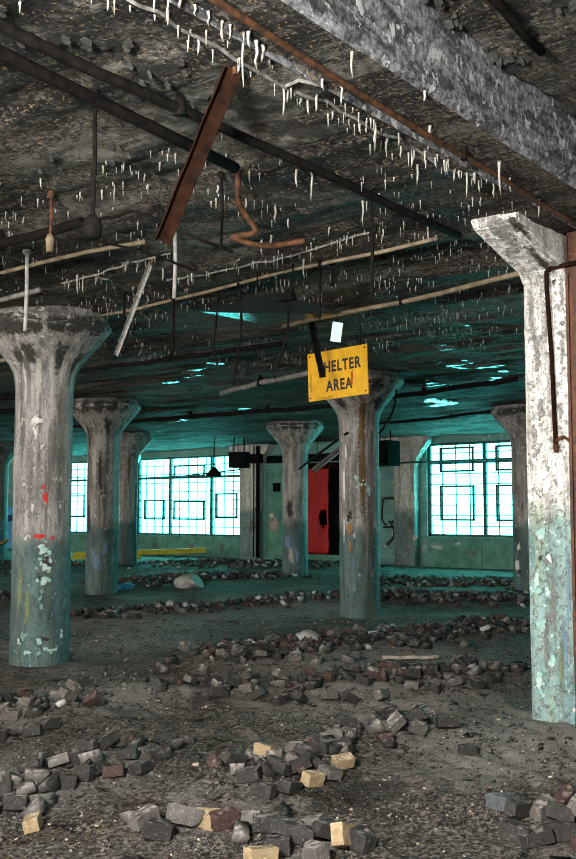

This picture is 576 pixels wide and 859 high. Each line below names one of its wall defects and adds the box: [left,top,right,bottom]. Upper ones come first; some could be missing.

leakage [263,117,339,139]
peeling [530,278,569,502]
peeling [35,540,52,585]
peeling [533,554,552,593]
peeling [17,637,57,655]
peeling [536,655,557,695]